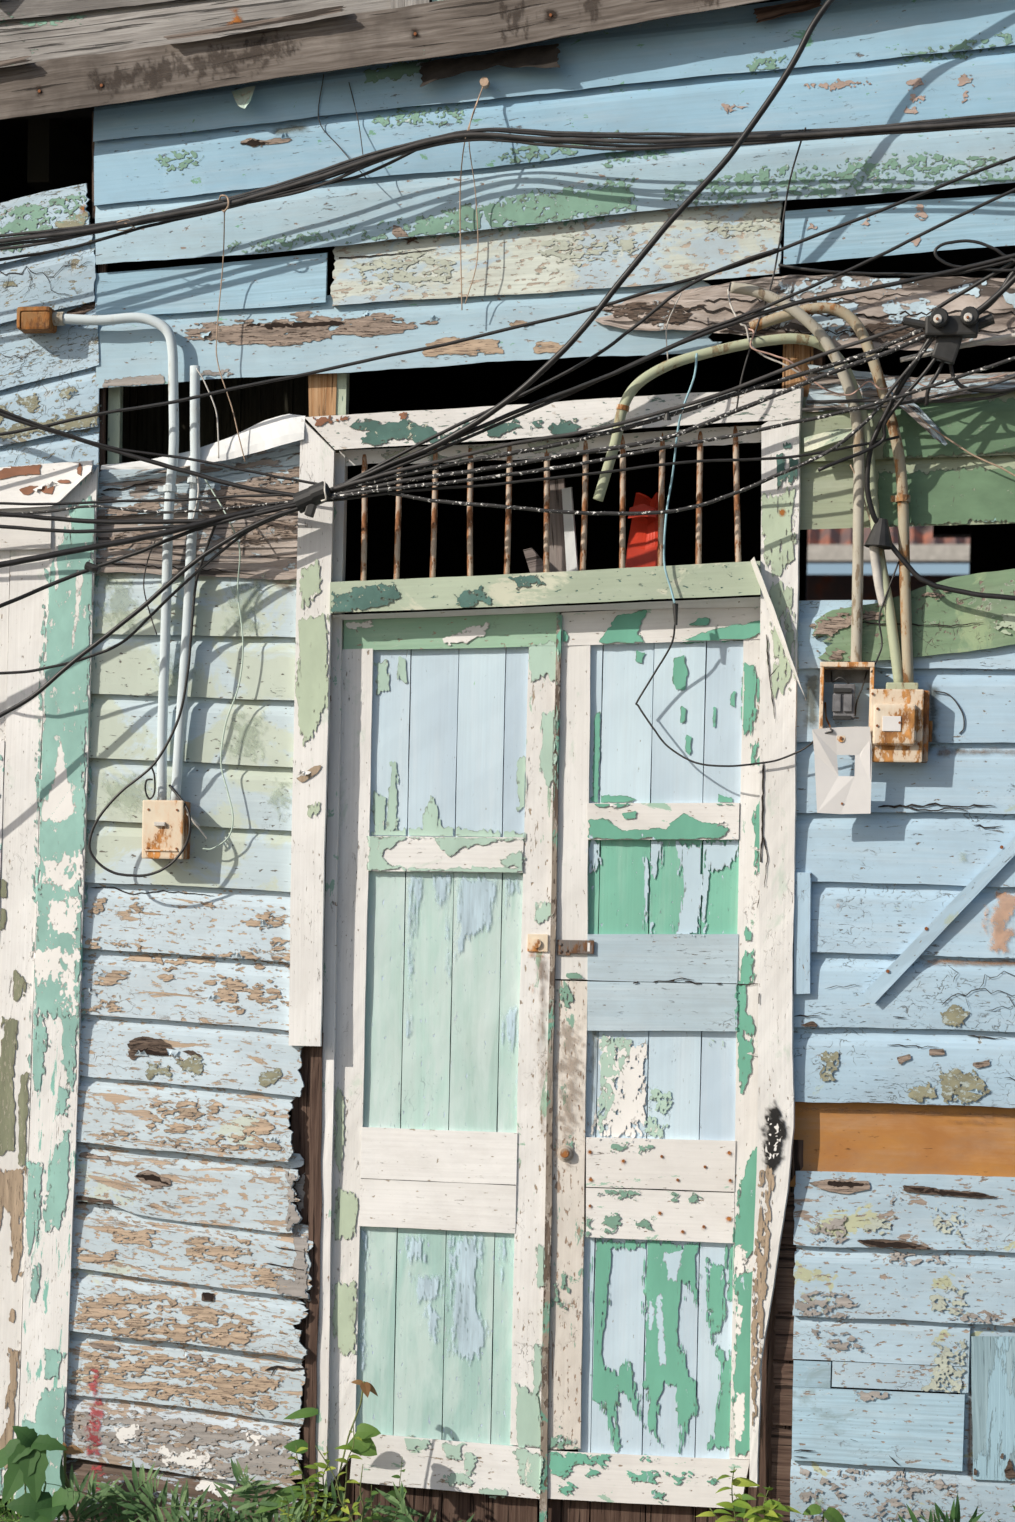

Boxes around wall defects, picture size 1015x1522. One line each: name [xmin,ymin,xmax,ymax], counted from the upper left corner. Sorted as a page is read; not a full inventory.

peeling [663,149,1015,246]
spalling [246,311,368,329]
peeling [0,386,103,441]
peeling [102,374,165,387]
peeling [0,463,82,495]
peeling [295,559,401,746]
peeling [0,496,291,1303]
crack [891,1016,933,1048]
crack [942,965,1015,1039]
peeling [591,1034,673,1154]
peeling [404,1117,781,1504]
peeling [0,1287,302,1499]